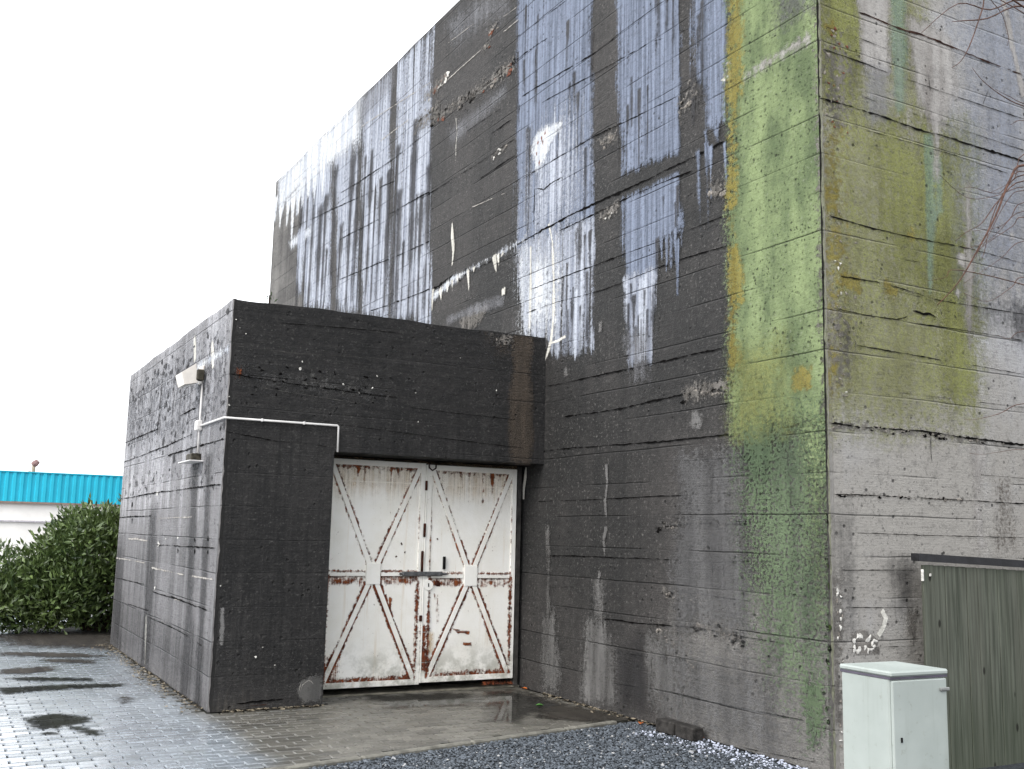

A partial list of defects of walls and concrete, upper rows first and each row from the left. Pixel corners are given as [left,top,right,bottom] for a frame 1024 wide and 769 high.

leakage [274,0,596,359]
spalling [413,56,515,140]
leakage [621,172,684,368]
leakage [615,0,730,203]
crack [831,216,1021,266]
leakage [885,0,977,403]
corrosion [323,335,534,685]
crack [347,421,1024,528]
leakage [669,350,828,634]